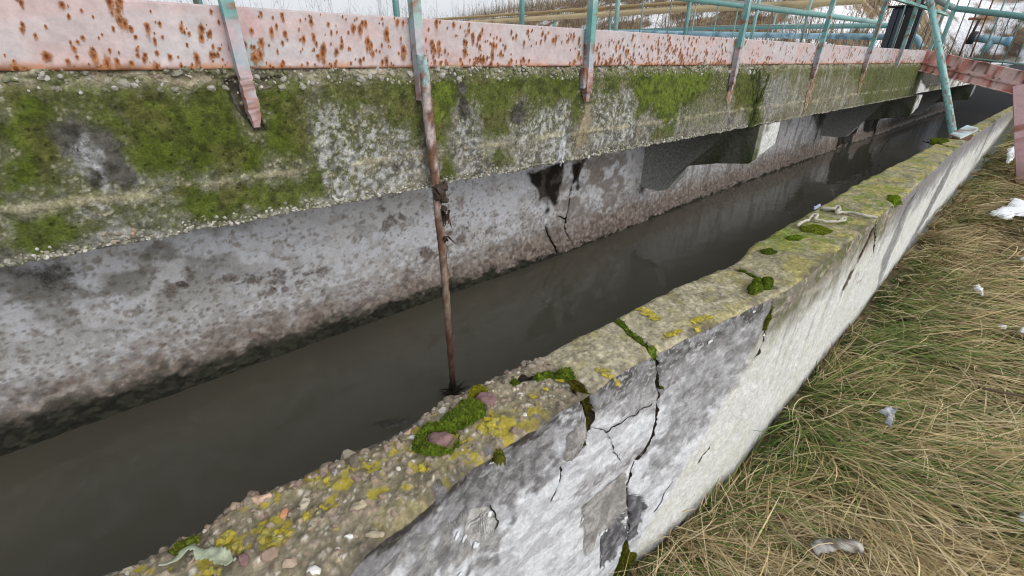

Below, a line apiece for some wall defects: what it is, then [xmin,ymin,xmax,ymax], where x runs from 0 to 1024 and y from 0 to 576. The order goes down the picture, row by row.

rust [16,0,48,40]
rust [65,0,230,70]
rust [243,11,413,69]
rust [426,19,927,93]
damp [382,208,418,232]
crack [545,168,577,253]
damp [166,267,194,298]
damp [222,266,327,295]
crack [517,374,535,383]
crack [572,320,673,541]
peeling [581,473,648,569]